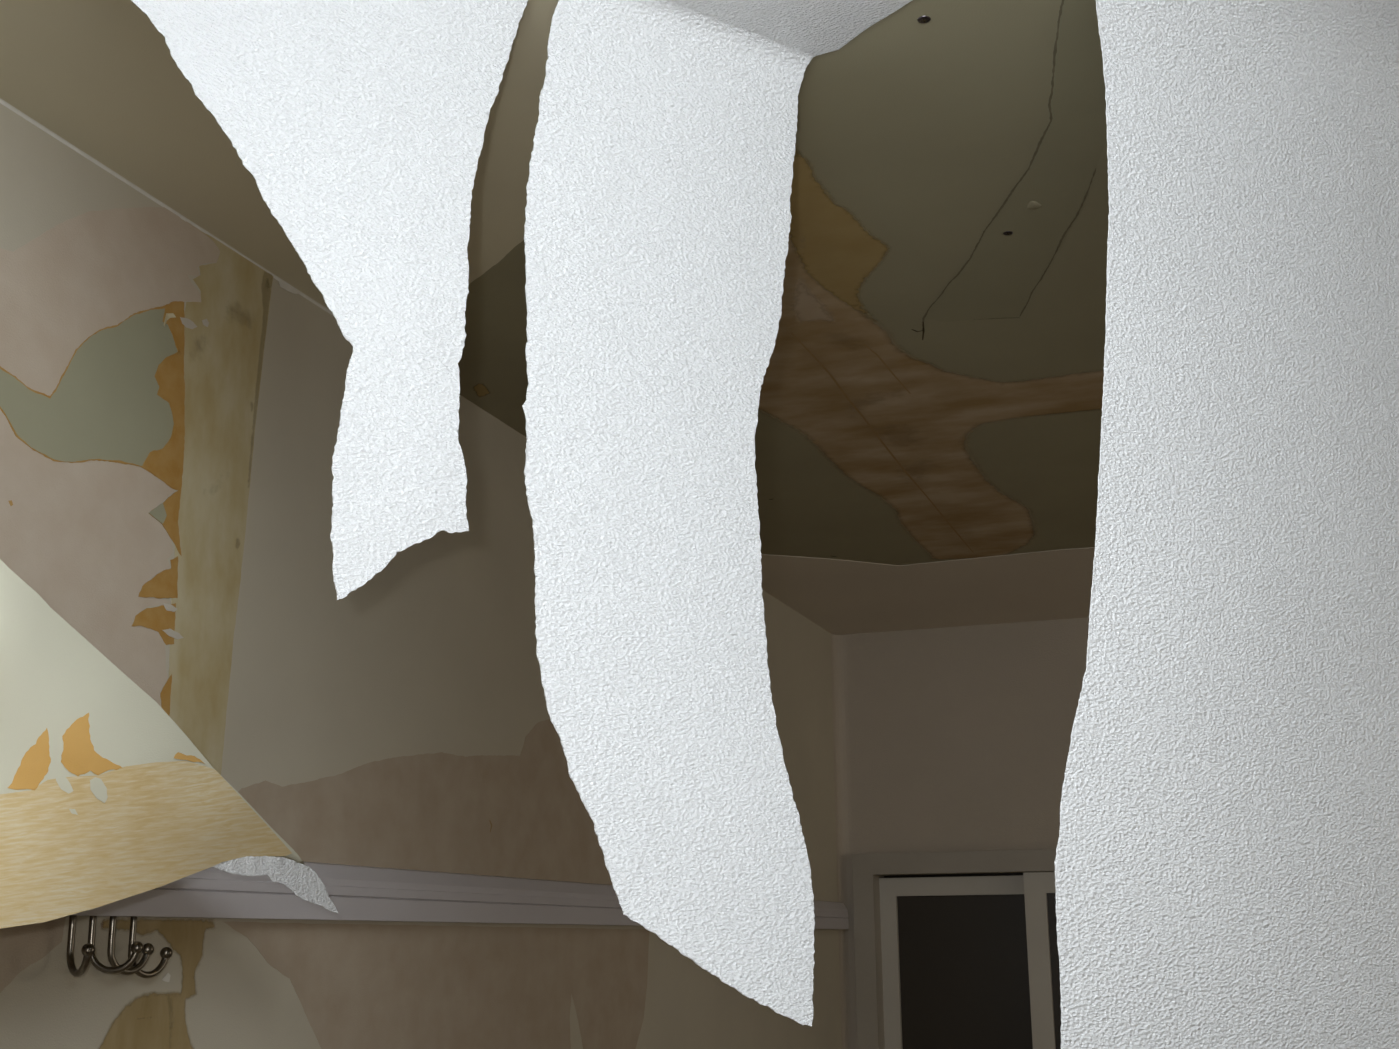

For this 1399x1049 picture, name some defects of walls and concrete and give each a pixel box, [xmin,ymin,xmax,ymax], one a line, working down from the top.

peeling [0,0,816,1027]
crack [911,0,1064,340]
crack [977,168,1096,320]
peeling [1054,0,1399,1049]